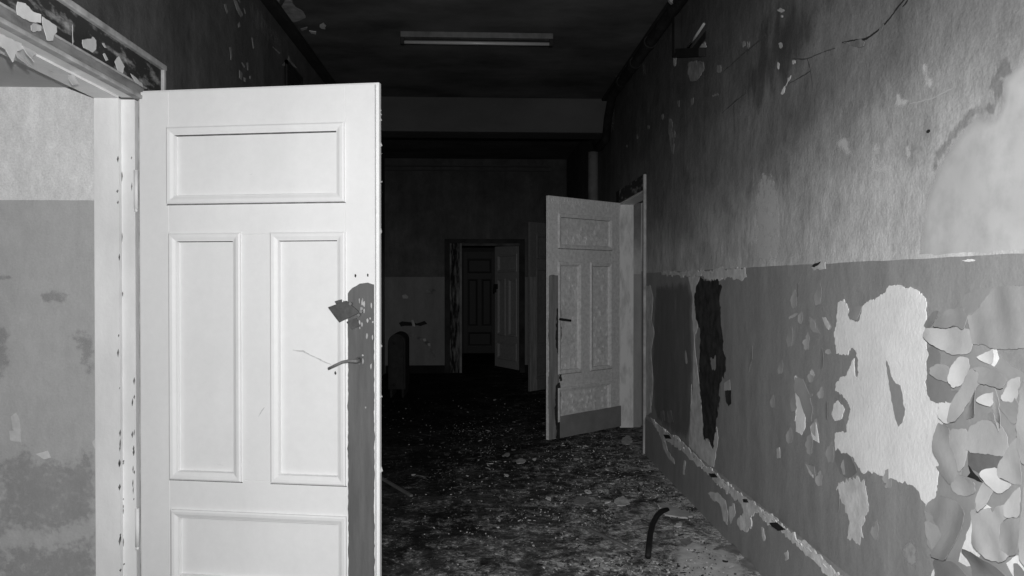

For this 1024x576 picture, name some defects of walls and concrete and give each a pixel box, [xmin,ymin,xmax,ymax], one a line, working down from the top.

crack [723,0,908,91]
damp [922,64,1024,256]
spalling [646,266,842,576]
peeling [777,282,1024,576]